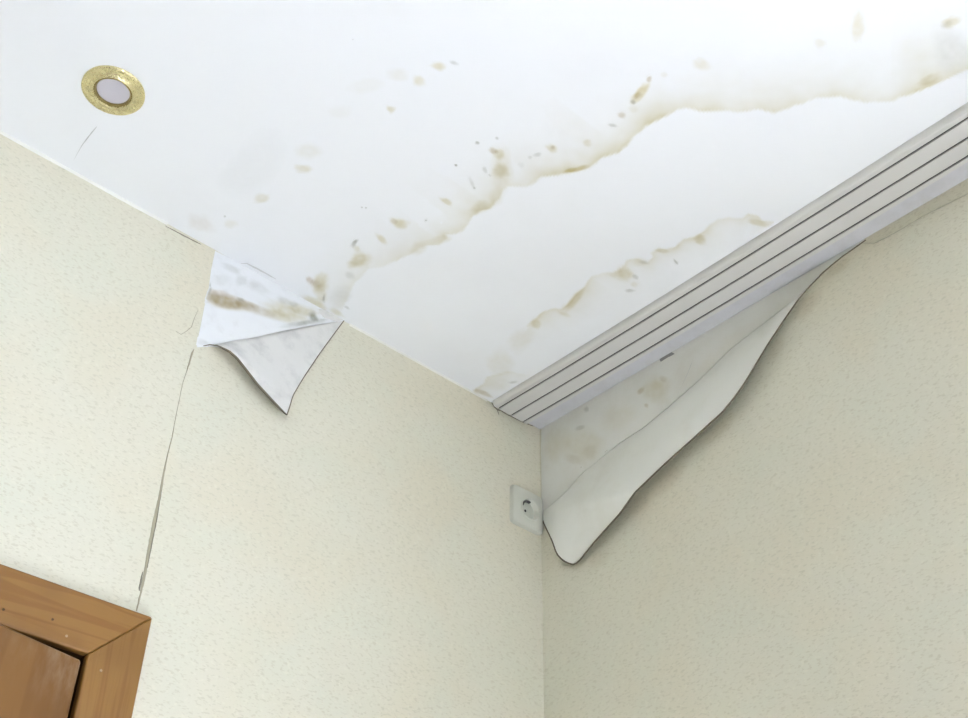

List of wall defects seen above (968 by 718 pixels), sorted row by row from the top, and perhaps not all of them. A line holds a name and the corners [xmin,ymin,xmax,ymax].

leakage [204,0,968,329]
flaking render [197,251,343,348]
leakage [471,212,776,402]
crack [136,311,198,611]
leakage [587,546,614,572]
leakage [625,460,689,519]